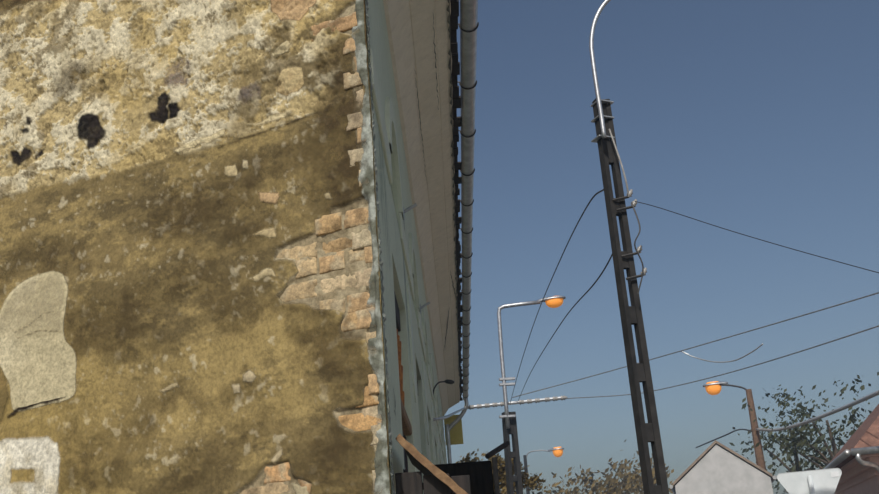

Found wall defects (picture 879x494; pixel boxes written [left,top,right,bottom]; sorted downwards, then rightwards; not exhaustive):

peeling [225,160,248,176]
flaking render [252,0,395,494]
leakage [300,324,368,378]
peeling [232,370,256,393]
flaking render [234,449,312,494]